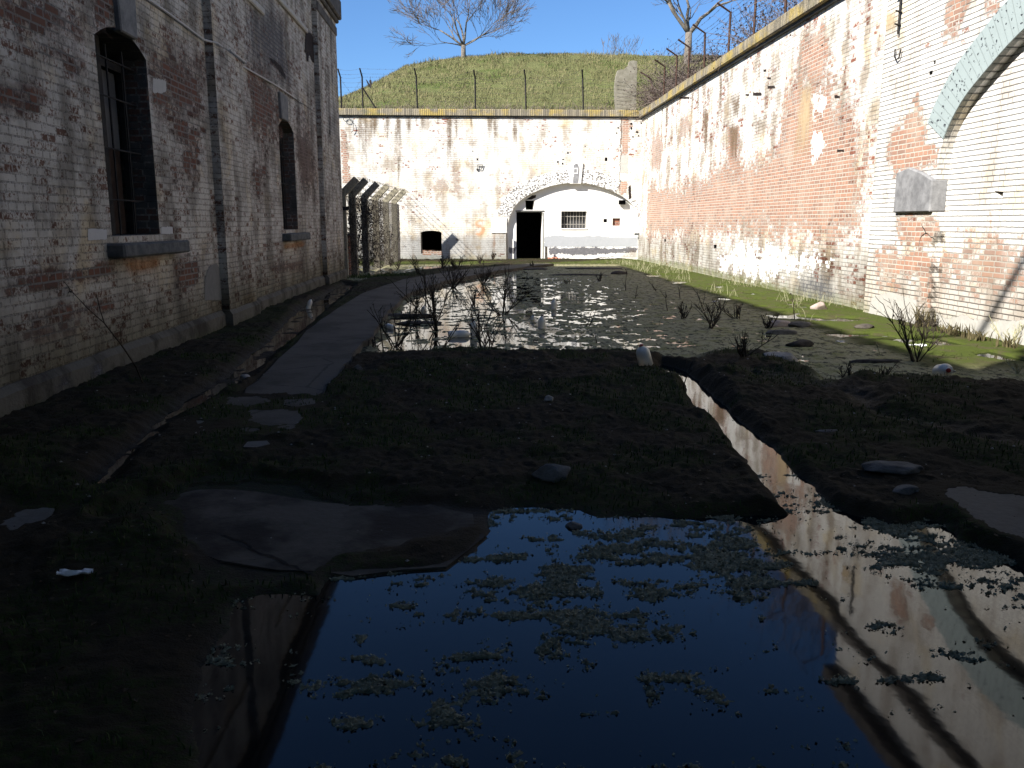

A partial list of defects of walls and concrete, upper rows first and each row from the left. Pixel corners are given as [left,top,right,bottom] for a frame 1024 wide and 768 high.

flaking render [0,0,114,77]
flaking render [943,0,970,46]
flaking render [985,0,1000,16]
flaking render [0,79,48,117]
flaking render [148,38,206,191]
water stain [359,117,424,138]
flaking render [544,23,871,259]
flaking render [886,92,939,178]
flaking render [875,212,1024,309]
flaking render [4,261,117,341]